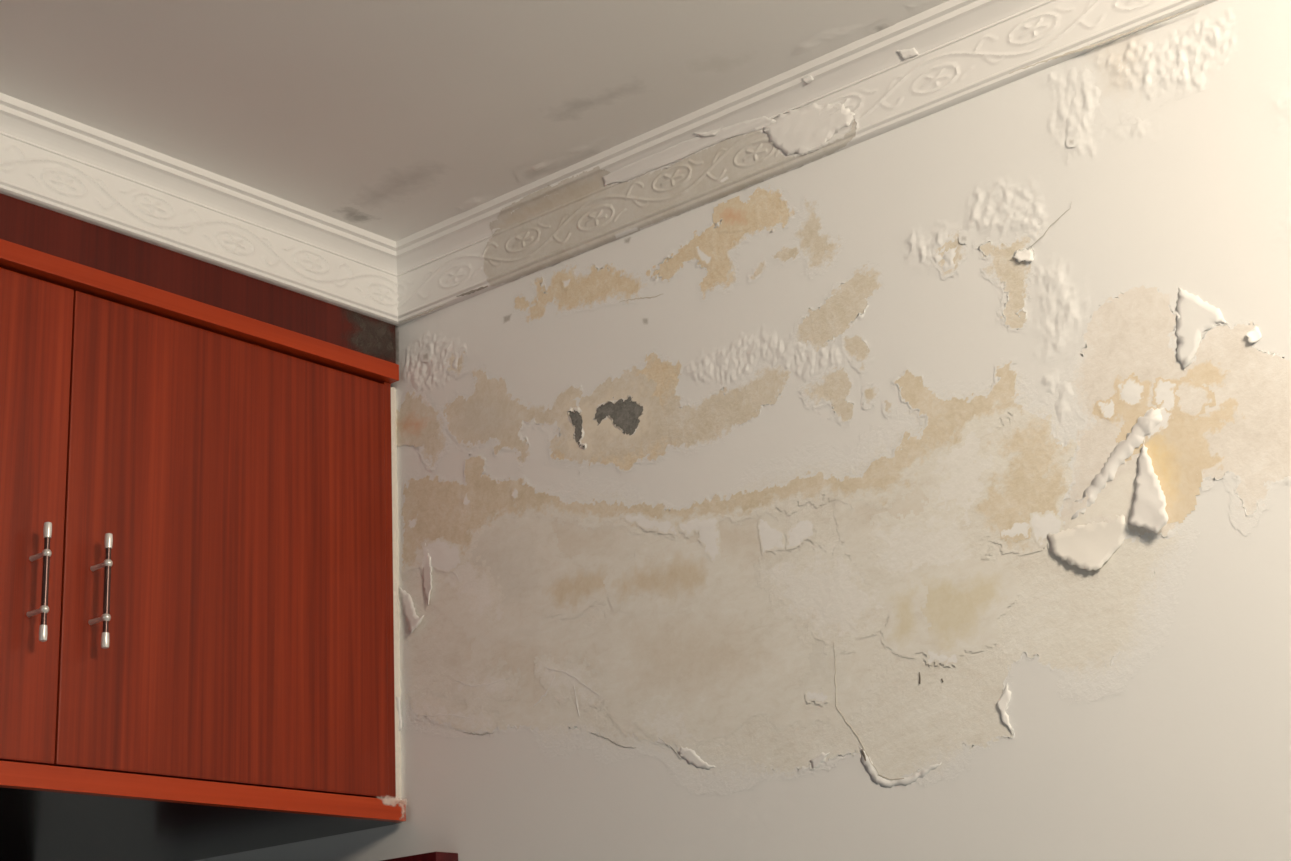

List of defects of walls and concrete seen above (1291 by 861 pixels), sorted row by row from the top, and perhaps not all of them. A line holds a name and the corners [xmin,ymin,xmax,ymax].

peeling [396,103,1291,797]